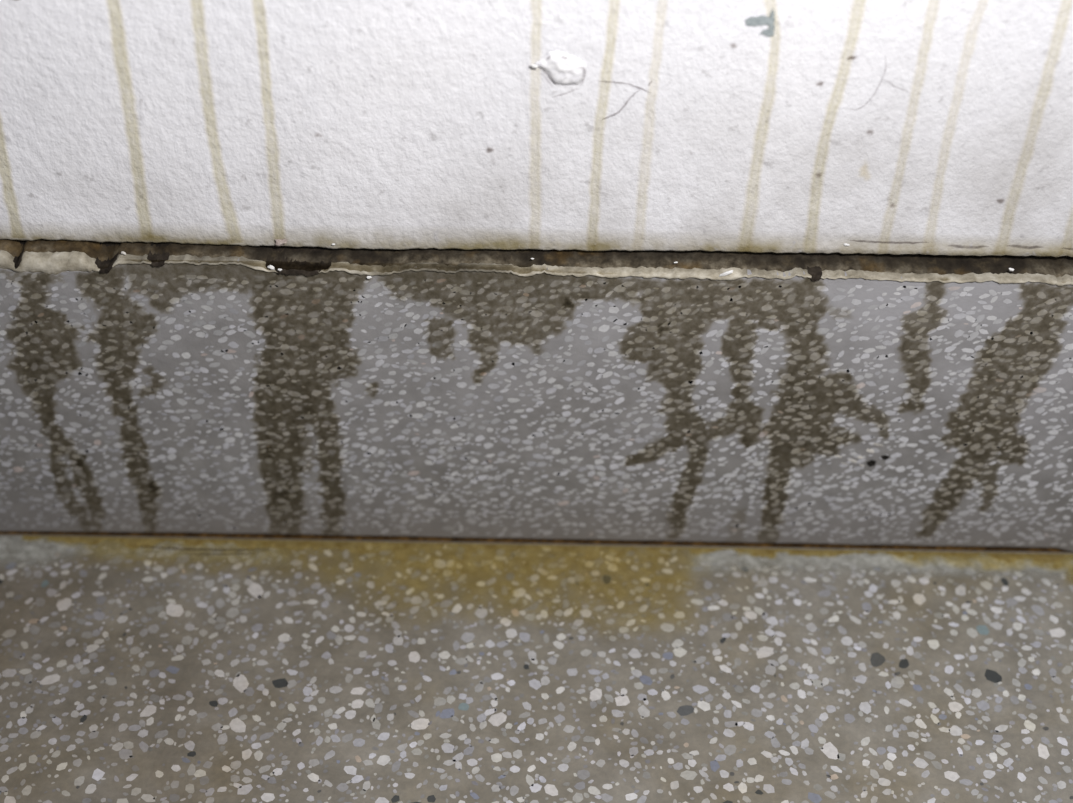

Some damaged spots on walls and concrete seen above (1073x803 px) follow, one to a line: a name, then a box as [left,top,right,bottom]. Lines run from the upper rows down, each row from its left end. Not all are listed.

damp [562,279,597,308]
damp [642,282,716,348]
damp [253,261,345,503]
damp [774,278,851,452]
damp [114,382,159,505]
efflorescence [0,536,72,559]
damp [695,549,1073,574]